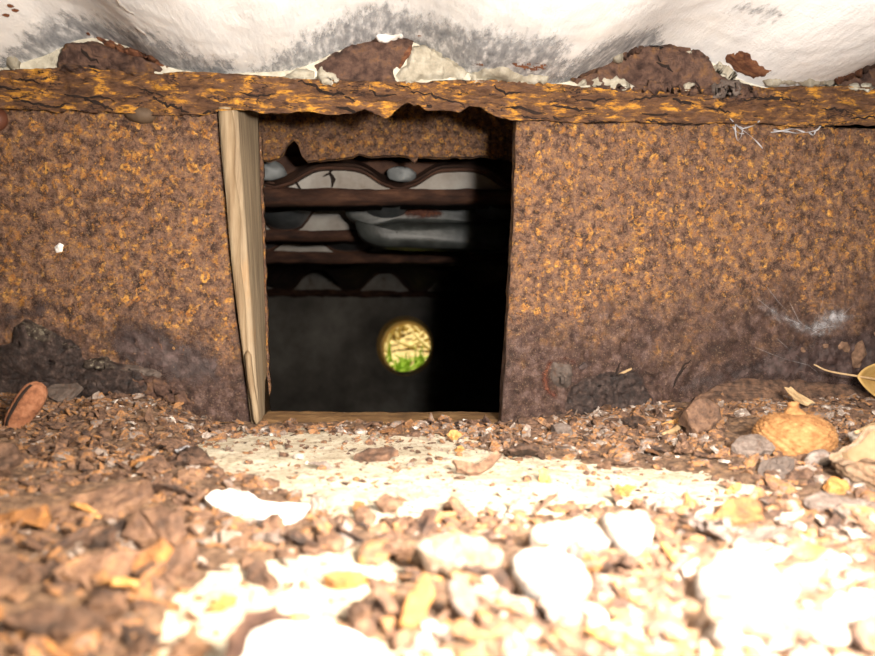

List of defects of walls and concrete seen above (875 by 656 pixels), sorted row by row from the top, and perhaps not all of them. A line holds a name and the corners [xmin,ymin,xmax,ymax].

peeling [0,15,232,76]
peeling [254,4,771,100]
spalling [834,64,875,89]
crack [0,78,120,113]
crack [139,88,219,117]